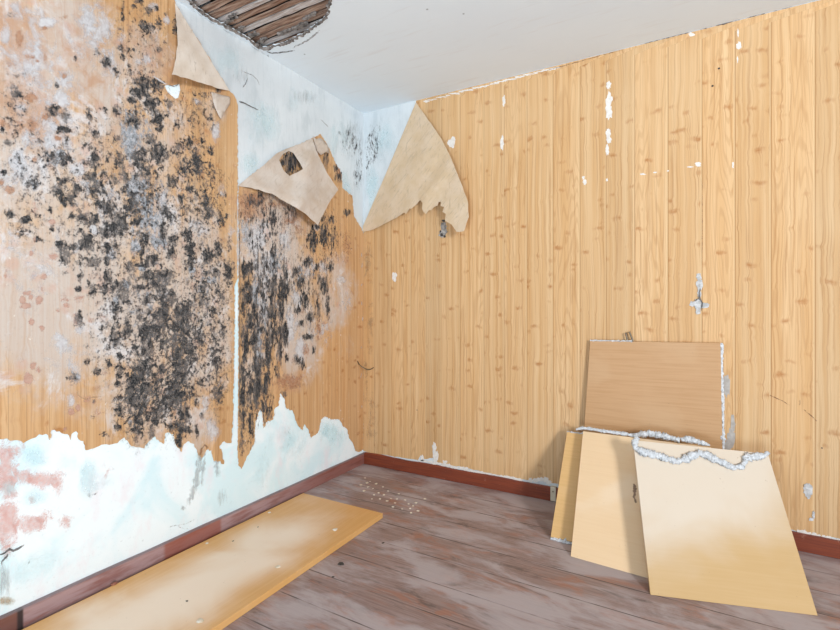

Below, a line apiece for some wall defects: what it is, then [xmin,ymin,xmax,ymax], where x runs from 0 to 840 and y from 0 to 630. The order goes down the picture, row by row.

leakage [0,0,349,509]
spalling [187,0,332,51]
peeling [605,81,613,155]
peeling [0,274,363,615]